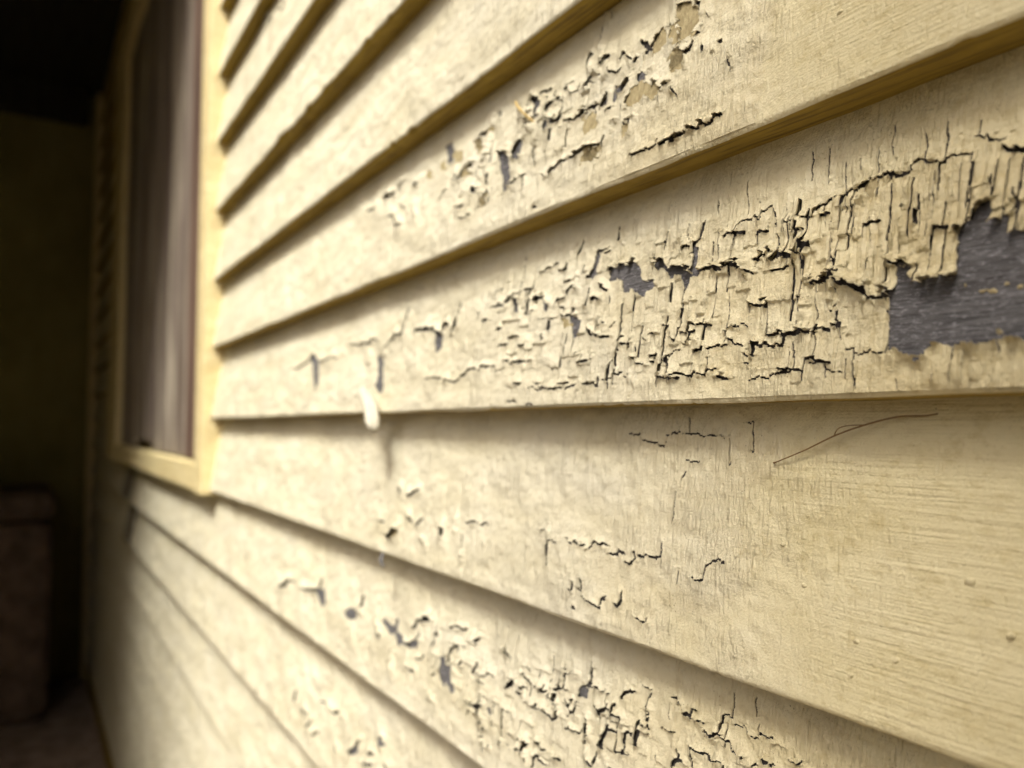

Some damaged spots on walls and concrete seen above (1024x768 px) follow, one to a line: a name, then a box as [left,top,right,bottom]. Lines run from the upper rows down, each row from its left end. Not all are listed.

peeling [354,0,776,254]
peeling [277,85,1024,432]
peeling [267,466,876,768]
crack [529,406,782,651]